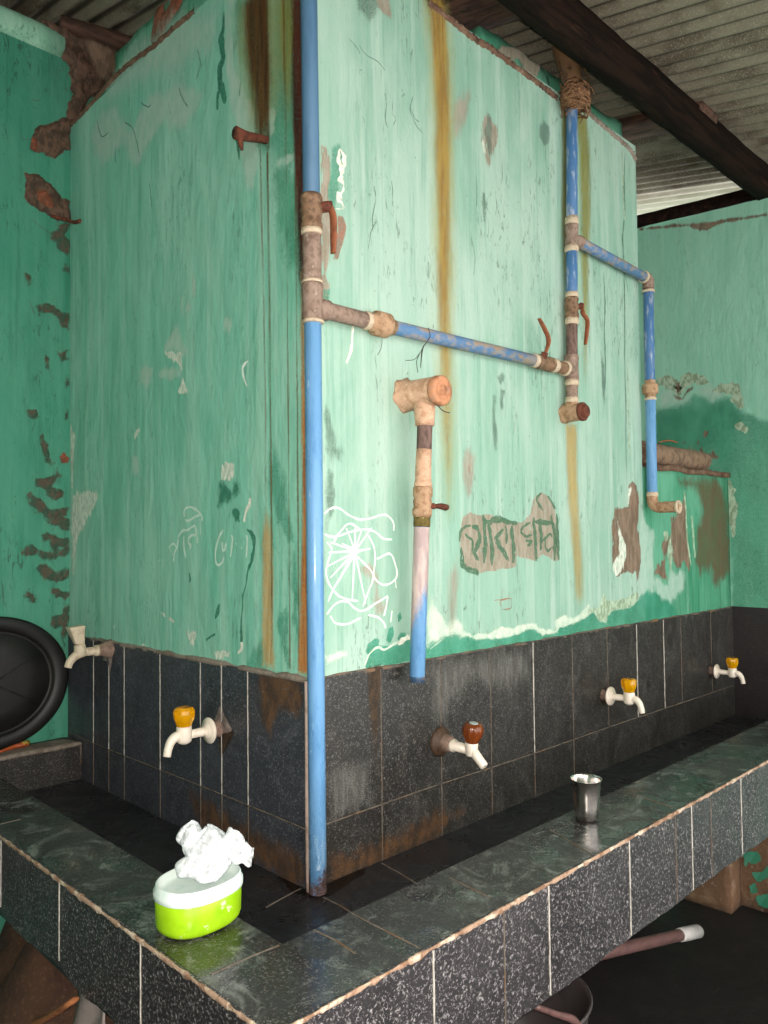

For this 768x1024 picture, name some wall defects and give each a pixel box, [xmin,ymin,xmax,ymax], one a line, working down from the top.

spalling [30,0,195,159]
spalling [24,172,71,273]
corrosion [418,0,460,334]
spalling [36,298,70,388]
corrosion [229,0,307,739]
corrosion [432,345,460,520]
spalling [21,409,98,653]
peeling [460,492,558,573]
corrosion [564,422,586,607]
peeling [611,481,696,606]
leakage [327,805,464,881]